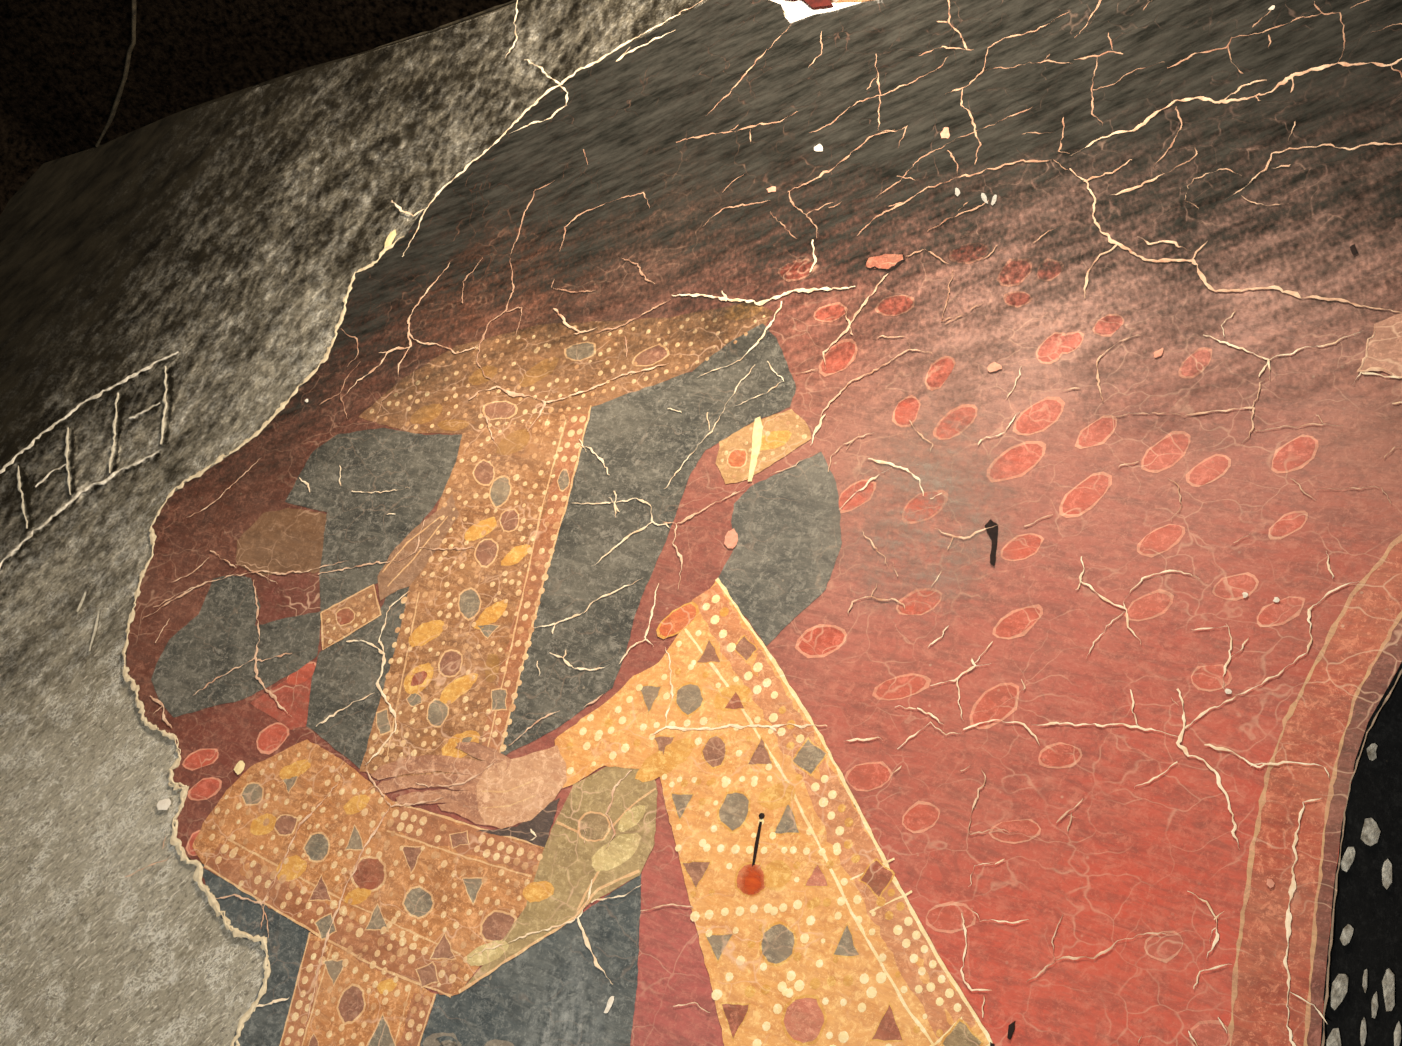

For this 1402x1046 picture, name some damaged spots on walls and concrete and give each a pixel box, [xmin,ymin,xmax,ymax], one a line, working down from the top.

spalling [771,0,869,23]
peeling [866,253,905,271]
peeling [1357,313,1402,379]
crack [299,465,409,515]
flaking render [0,0,708,1046]
peeling [724,528,738,549]
crack [319,0,1402,1046]
spalling [985,519,998,566]
crack [143,520,475,716]
crack [150,696,172,728]
crack [256,591,558,1027]
crack [215,782,339,937]